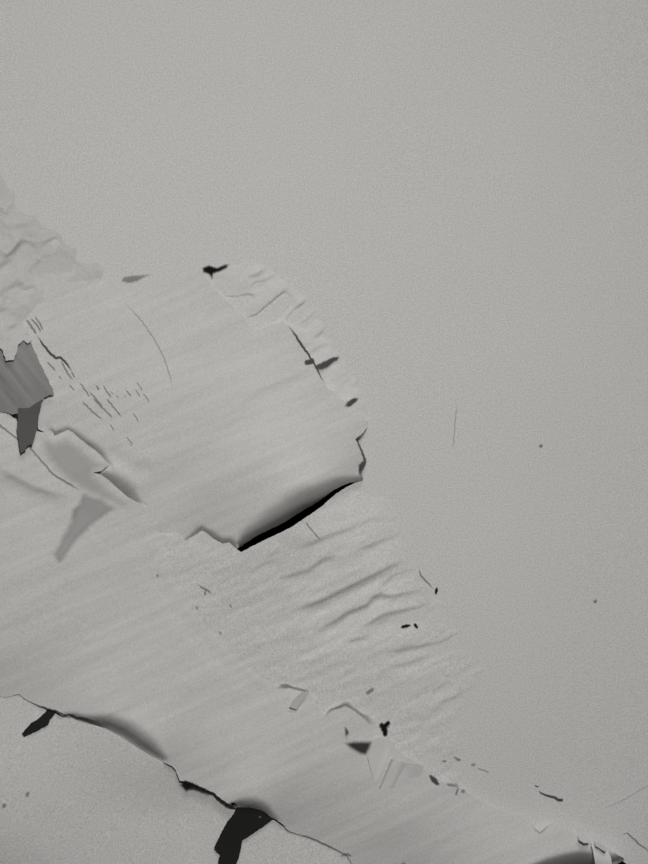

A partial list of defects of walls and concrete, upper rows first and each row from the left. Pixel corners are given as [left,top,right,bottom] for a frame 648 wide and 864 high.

peeling [0,256,626,864]